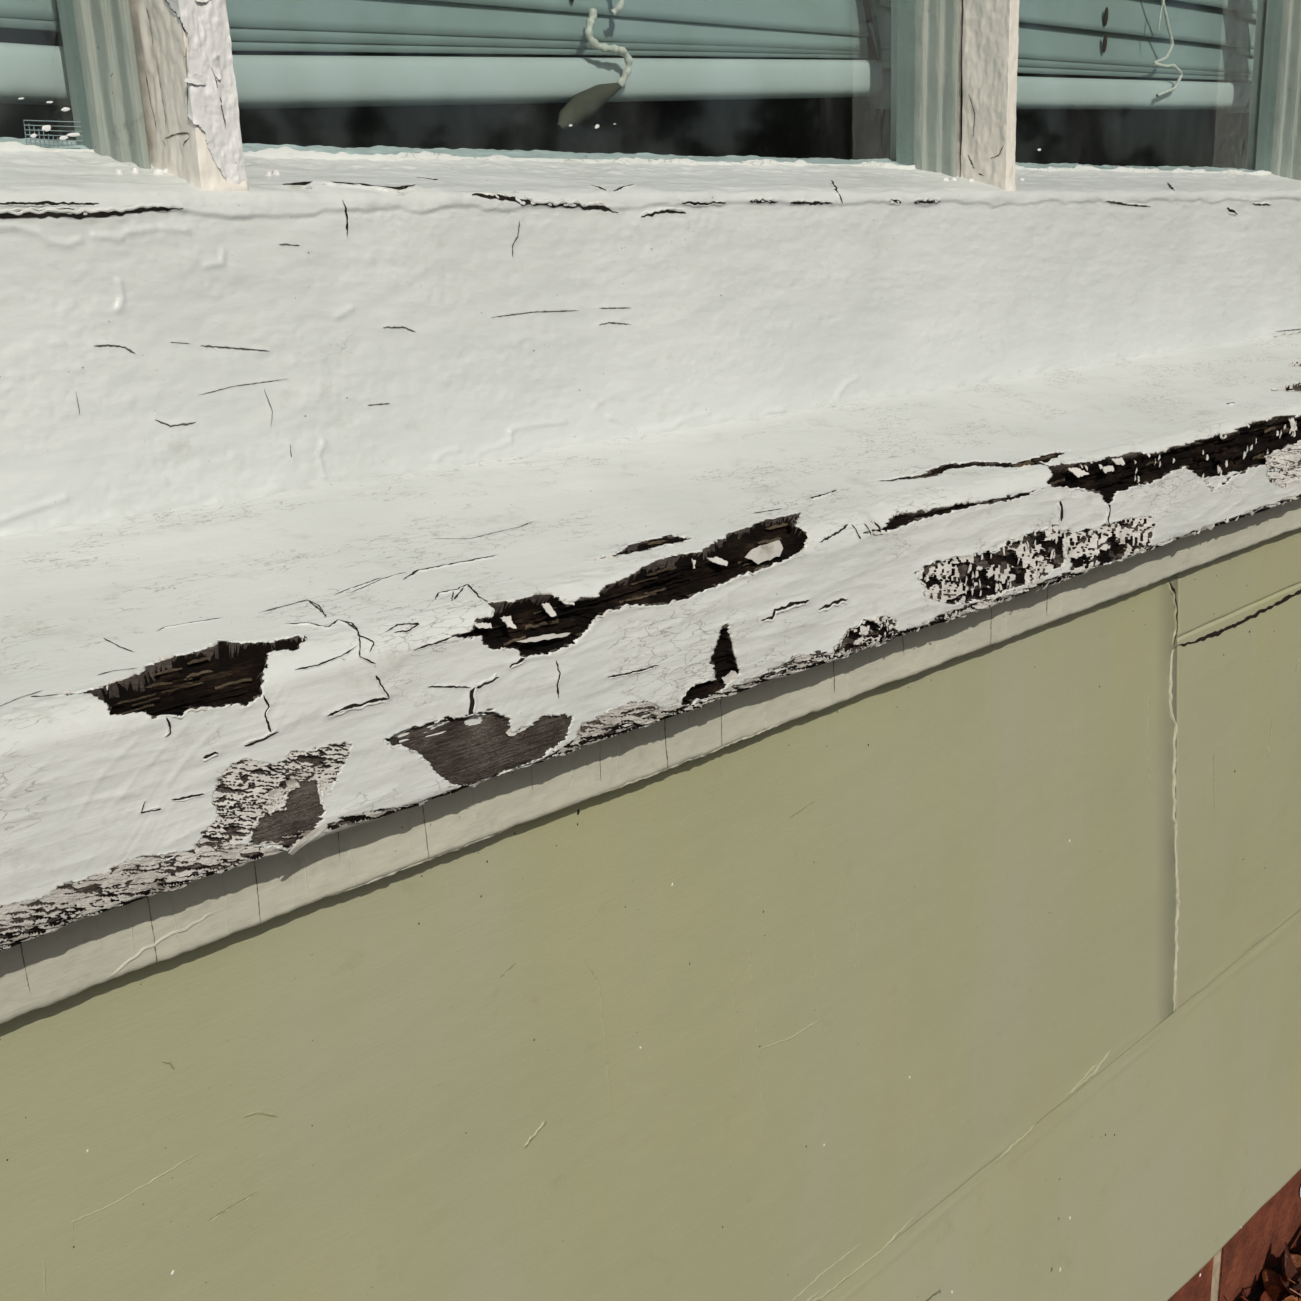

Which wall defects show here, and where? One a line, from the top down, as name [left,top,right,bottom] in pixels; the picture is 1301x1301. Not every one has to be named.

peeling [167,0,248,185]
crack [96,344,134,353]
crack [156,342,292,458]
spalling [1271,358,1301,392]
crack [818,520,887,542]
crack [258,521,533,720]
crack [761,598,848,624]
crack [1167,581,1301,648]
crack [607,665,659,680]
peeling [0,418,1301,951]
crack [203,693,278,762]
crack [140,793,204,813]